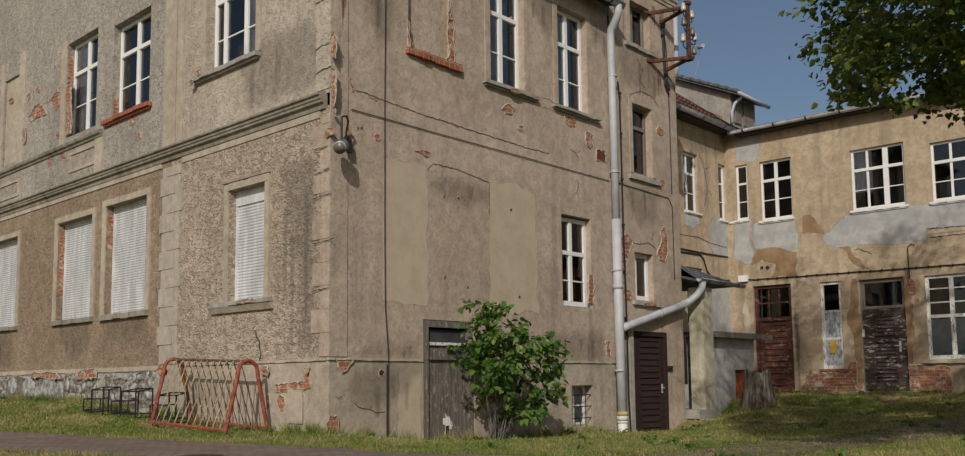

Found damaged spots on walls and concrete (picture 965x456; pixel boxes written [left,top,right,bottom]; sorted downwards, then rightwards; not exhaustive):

spalling [446,0,456,62]
spalling [22,54,74,145]
spalling [621,234,633,300]
spalling [656,226,669,263]
peeling [752,247,798,277]
peeling [842,246,869,269]
spalling [800,279,864,393]
spalling [903,276,964,393]
spalling [0,365,163,410]
spalling [265,364,312,412]